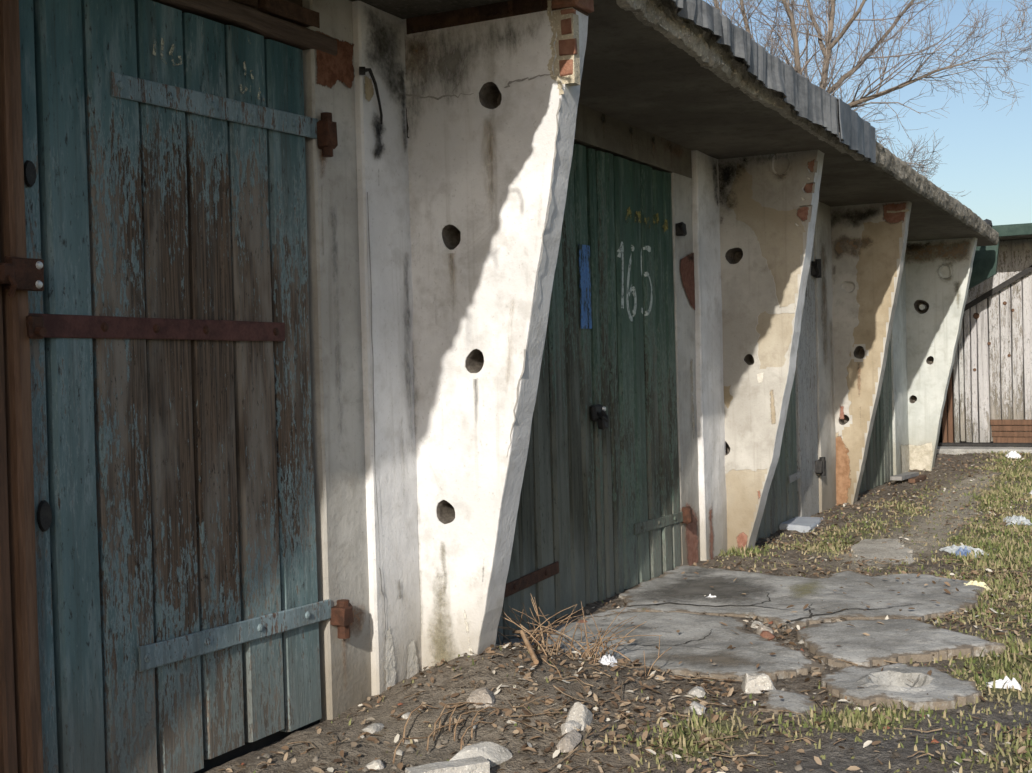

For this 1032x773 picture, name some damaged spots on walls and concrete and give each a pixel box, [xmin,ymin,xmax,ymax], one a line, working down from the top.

spalling [316,31,374,101]
leakage [374,116,384,158]
spalling [680,253,695,310]
flaking render [726,160,814,424]
flaking render [836,203,909,506]
flaking render [724,385,733,408]
crack [545,594,911,650]